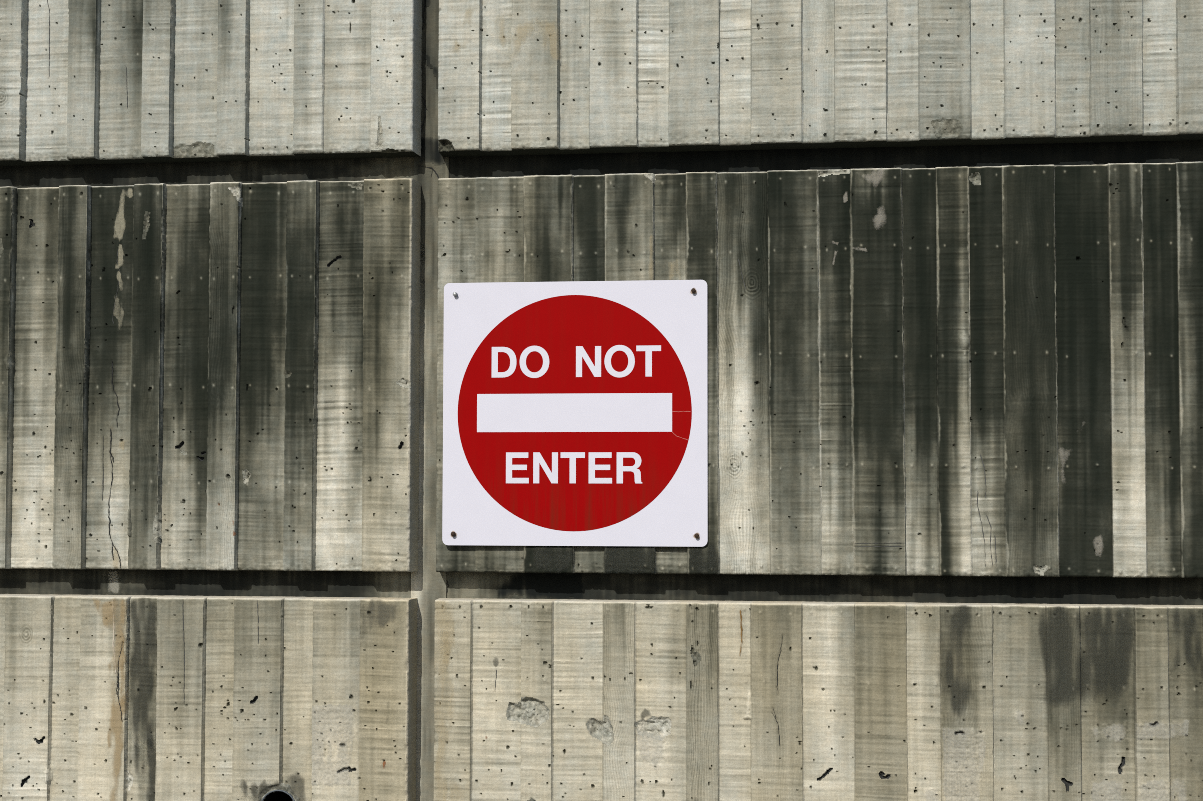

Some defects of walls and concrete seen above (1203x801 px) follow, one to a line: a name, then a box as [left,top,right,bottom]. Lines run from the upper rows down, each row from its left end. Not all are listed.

damp [115,189,133,280]
crack [102,362,121,566]
damp [952,606,966,635]
damp [131,602,156,801]
spalling [506,696,549,727]
spalling [586,715,614,746]
spalling [634,716,672,741]
damp [946,653,967,711]
damp [1041,608,1131,702]
damp [243,777,303,800]